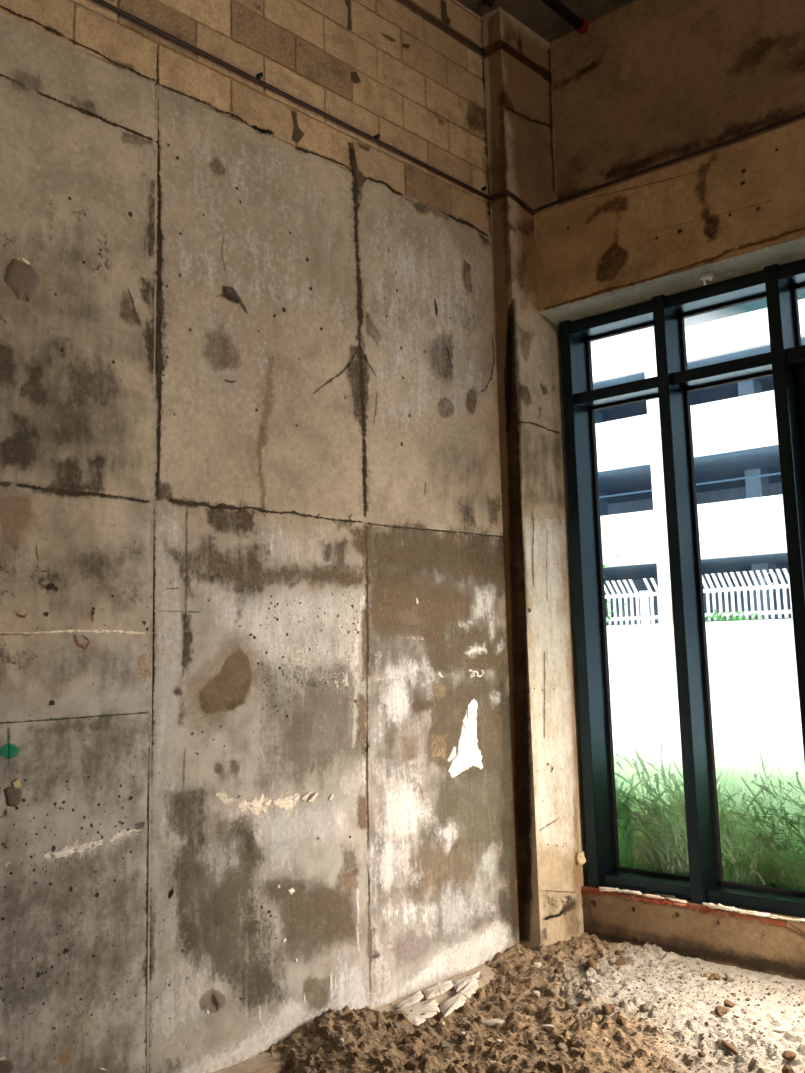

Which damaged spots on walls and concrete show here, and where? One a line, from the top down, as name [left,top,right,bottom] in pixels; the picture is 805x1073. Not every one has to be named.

damp [606,102,801,240]
damp [597,243,628,282]
damp [121,278,165,392]
damp [0,344,46,404]
damp [0,415,37,469]
damp [42,456,104,495]
damp [148,299,583,1073]
flaking render [447,699,483,778]
spalling [216,761,366,817]
damp [44,823,144,860]